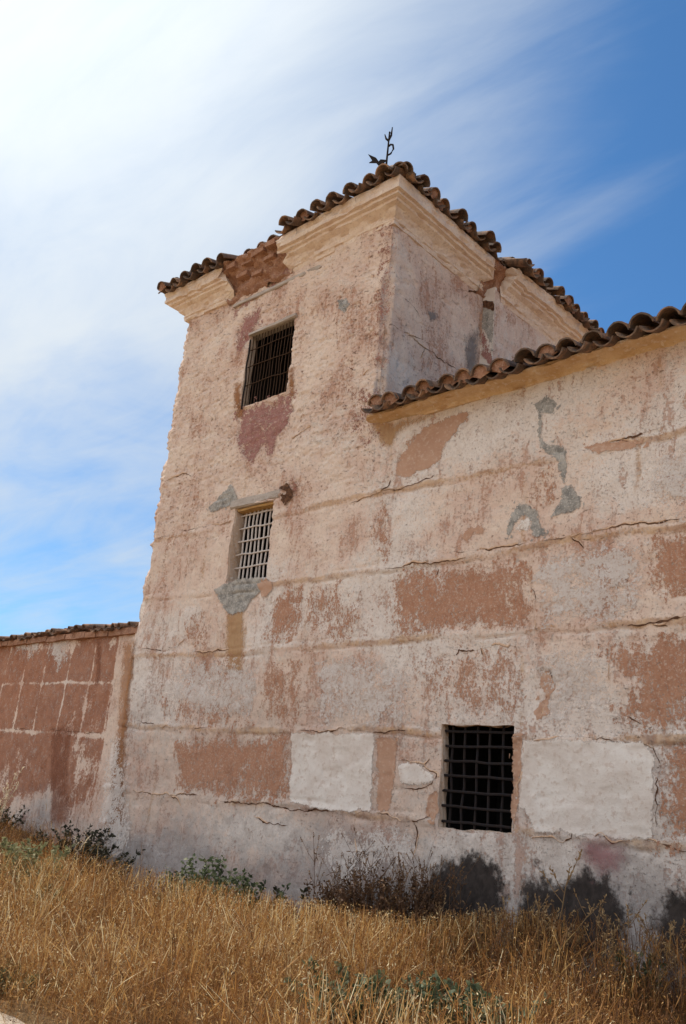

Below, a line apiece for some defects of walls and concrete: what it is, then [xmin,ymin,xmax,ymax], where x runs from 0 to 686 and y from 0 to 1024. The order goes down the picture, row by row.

flaking render [226,238,288,288]
peeling [233,390,298,471]
peeling [392,411,468,477]
crack [608,416,686,442]
crack [351,476,433,503]
crack [388,518,678,575]
peeling [373,505,555,724]
crack [628,616,686,627]
peeling [160,577,360,815]
crack [529,670,686,852]
peeling [596,622,686,863]
crack [134,790,429,856]